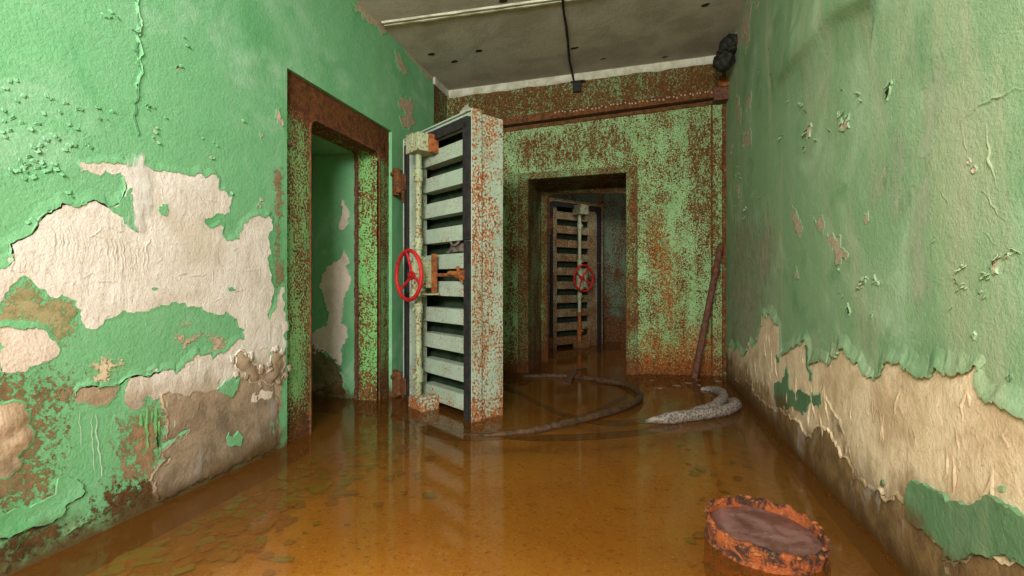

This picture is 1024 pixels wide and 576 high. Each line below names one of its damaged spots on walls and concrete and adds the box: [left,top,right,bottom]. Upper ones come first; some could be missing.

crack [133,0,144,137]
peeling [0,78,291,503]
peeling [312,248,353,396]
rust [287,71,389,402]
spalling [398,95,416,131]
rust [447,67,722,386]
spalling [788,193,849,274]
peeling [715,304,1024,576]